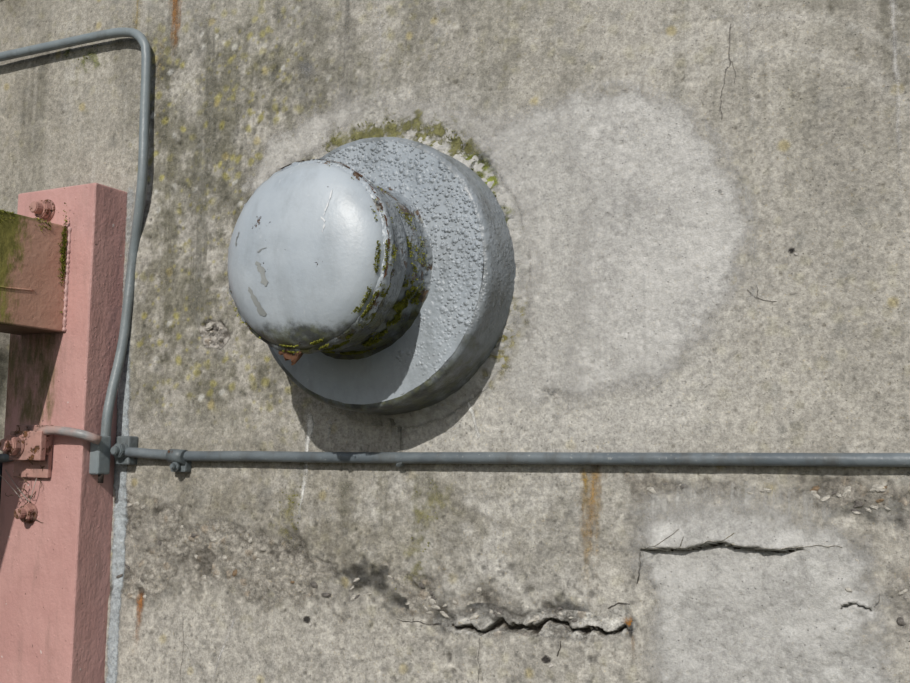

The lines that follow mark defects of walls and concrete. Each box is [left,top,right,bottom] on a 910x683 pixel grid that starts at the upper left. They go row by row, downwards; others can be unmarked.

corrosion [172,0,180,43]
spalling [110,492,337,612]
crack [397,529,842,683]